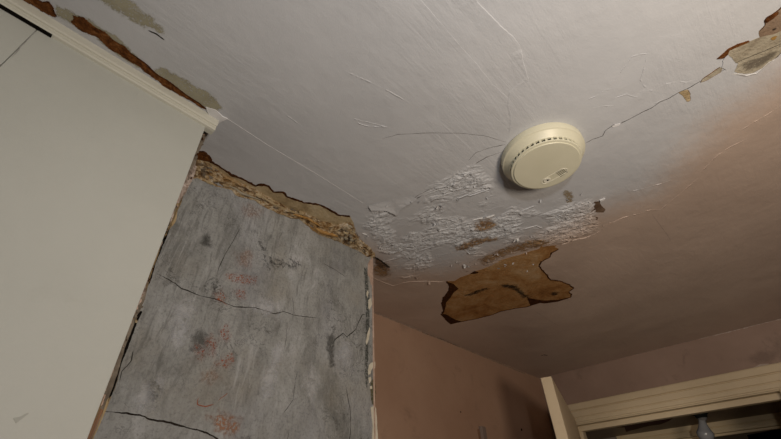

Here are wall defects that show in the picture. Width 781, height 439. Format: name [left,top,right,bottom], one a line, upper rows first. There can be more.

leakage [102,0,164,33]
peeling [700,7,781,83]
crack [155,272,315,349]
peeling [87,131,605,439]
crack [106,411,218,439]